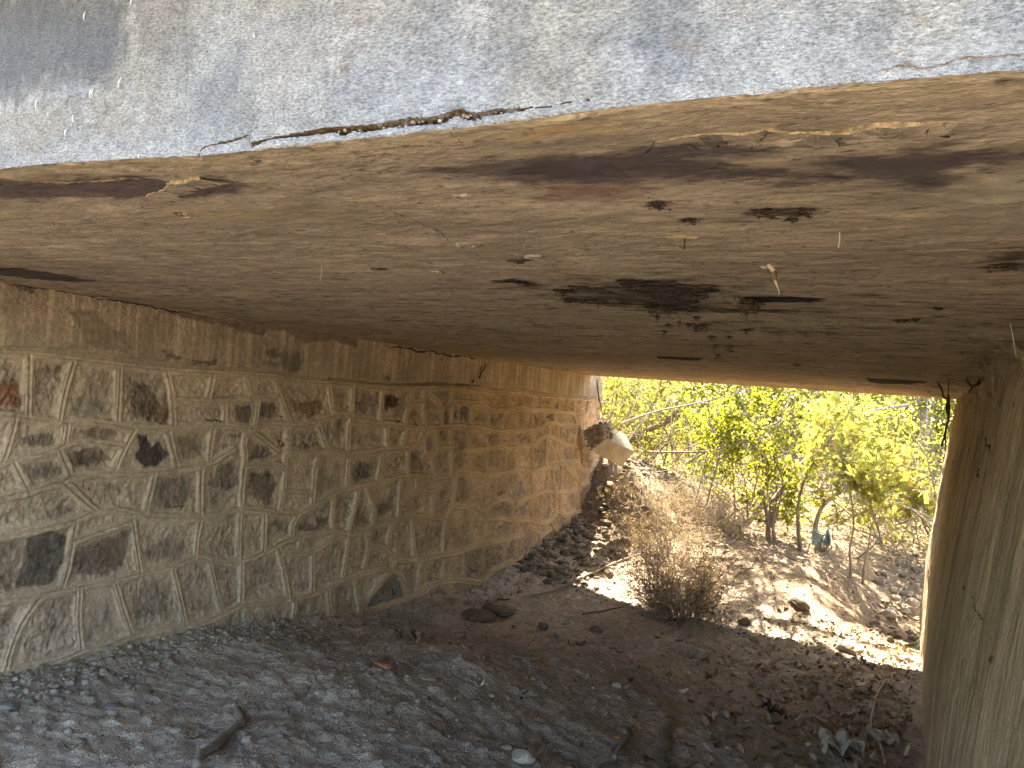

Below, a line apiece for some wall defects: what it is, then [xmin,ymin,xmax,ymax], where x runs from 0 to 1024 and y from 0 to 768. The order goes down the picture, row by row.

crack [144,99,590,203]
peeling [763,138,803,147]
leakage [426,143,1024,189]
leakage [0,175,167,199]
leakage [178,175,247,198]
leakage [0,268,92,294]